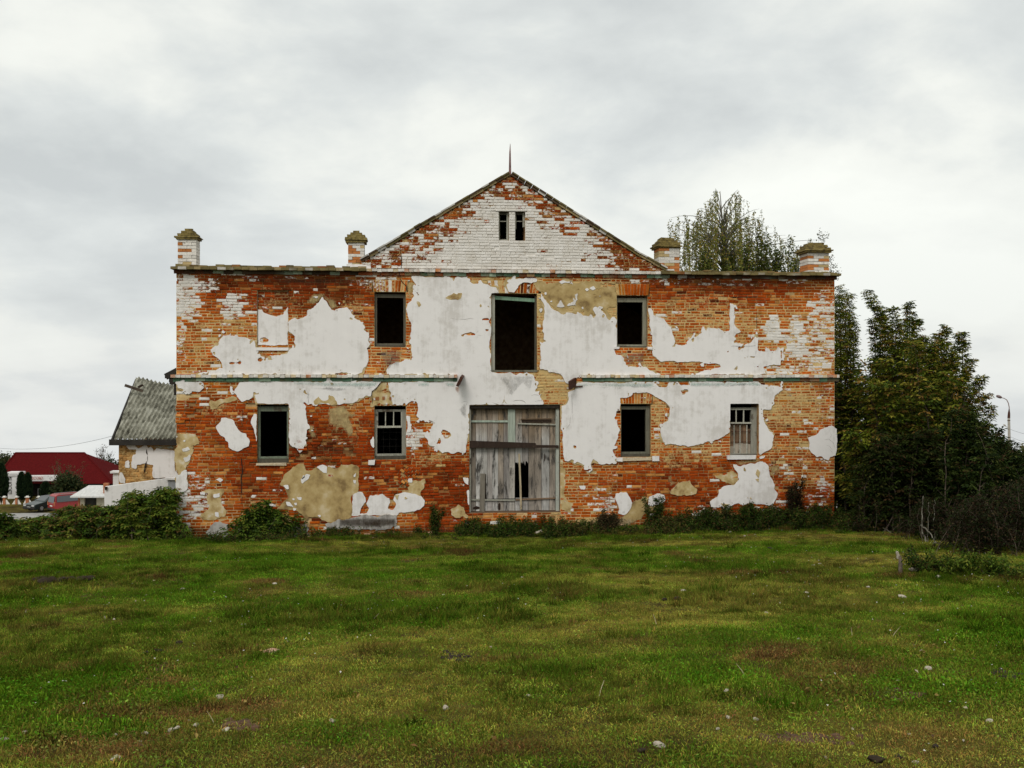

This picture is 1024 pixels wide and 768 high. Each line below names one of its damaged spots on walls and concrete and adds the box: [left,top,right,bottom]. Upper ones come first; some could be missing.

spalling [119,177,837,538]